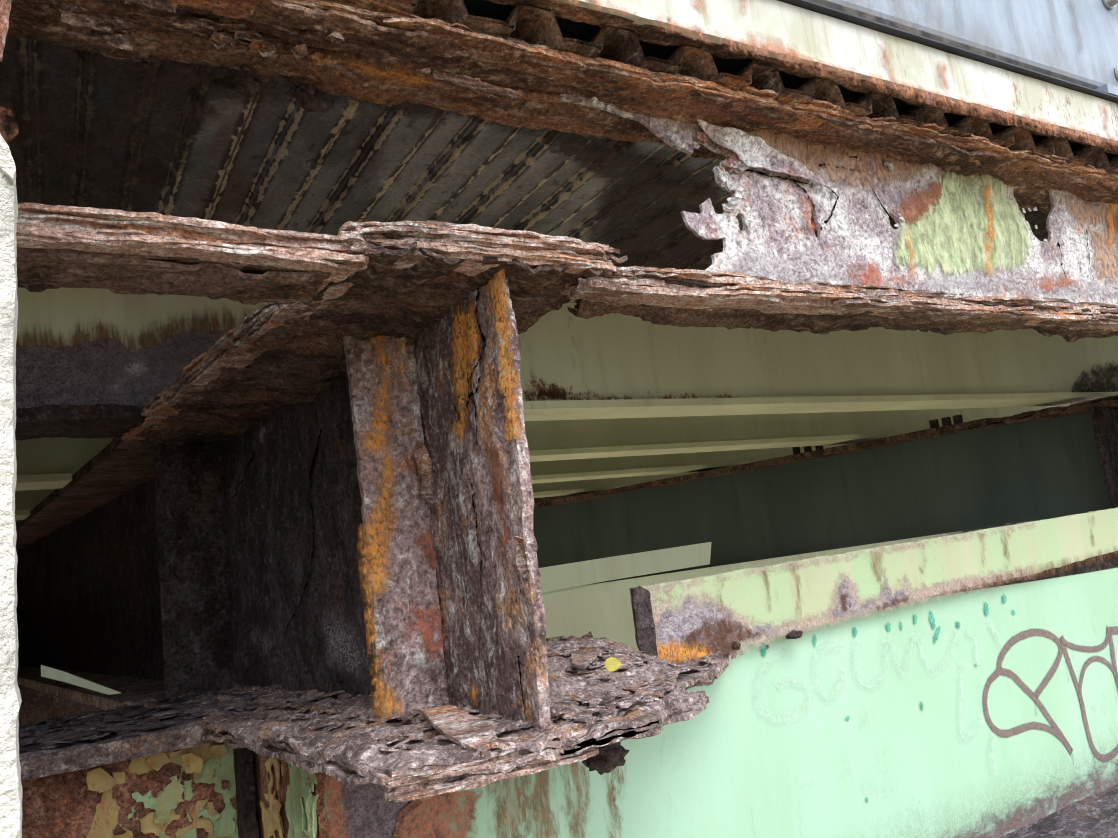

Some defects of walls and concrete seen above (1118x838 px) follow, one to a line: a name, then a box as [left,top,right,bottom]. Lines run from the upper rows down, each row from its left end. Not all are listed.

rust [0,0,1118,579]
crack [732,153,894,231]
peeling [894,171,1048,276]
crack [1057,228,1095,284]
crack [453,288,486,445]
rust [360,335,435,642]
rust [631,540,1070,663]
rust [374,660,401,714]
rust [663,691,709,726]
peeling [86,742,239,838]
peeling [260,757,319,838]
rust [306,725,599,838]